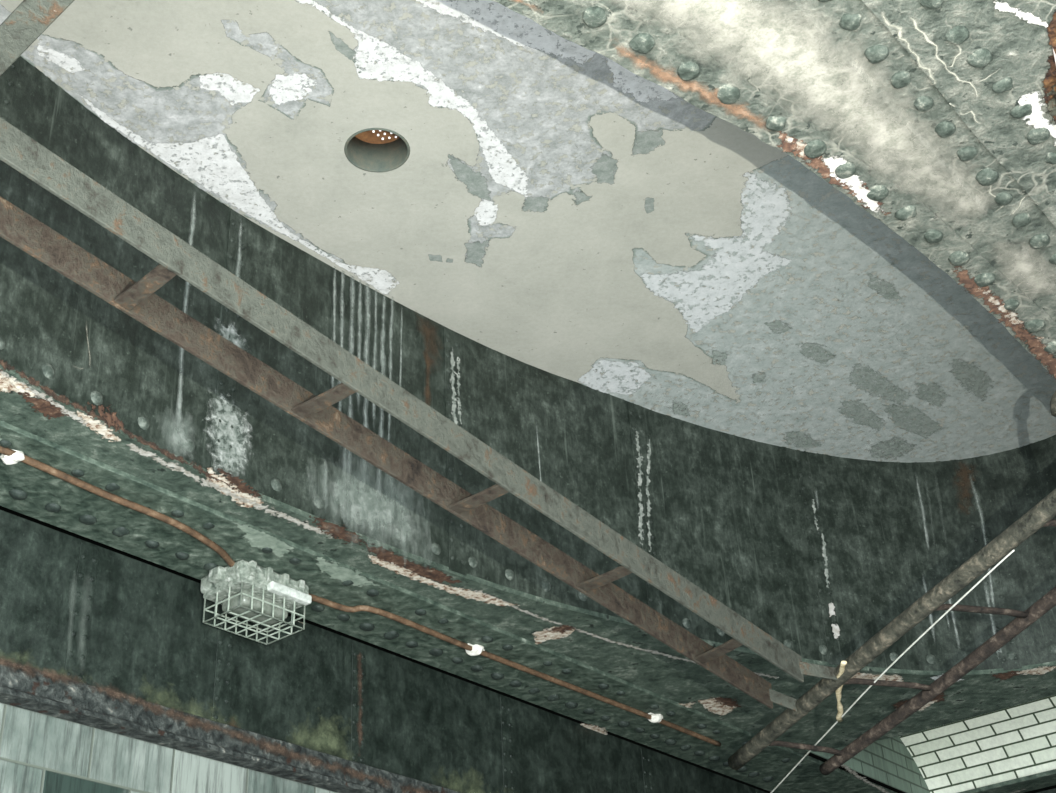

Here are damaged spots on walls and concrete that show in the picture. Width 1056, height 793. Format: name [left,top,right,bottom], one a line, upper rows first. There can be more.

peeling [21,20,400,295]
peeling [295,0,717,267]
peeling [625,0,985,214]
spalling [993,0,1056,146]
peeling [0,360,333,538]
water stain [207,396,249,477]
water stain [333,273,402,386]
water stain [324,448,413,545]
water stain [450,349,463,424]
water stain [635,431,651,552]
peeling [578,131,1056,463]
water stain [828,602,840,639]